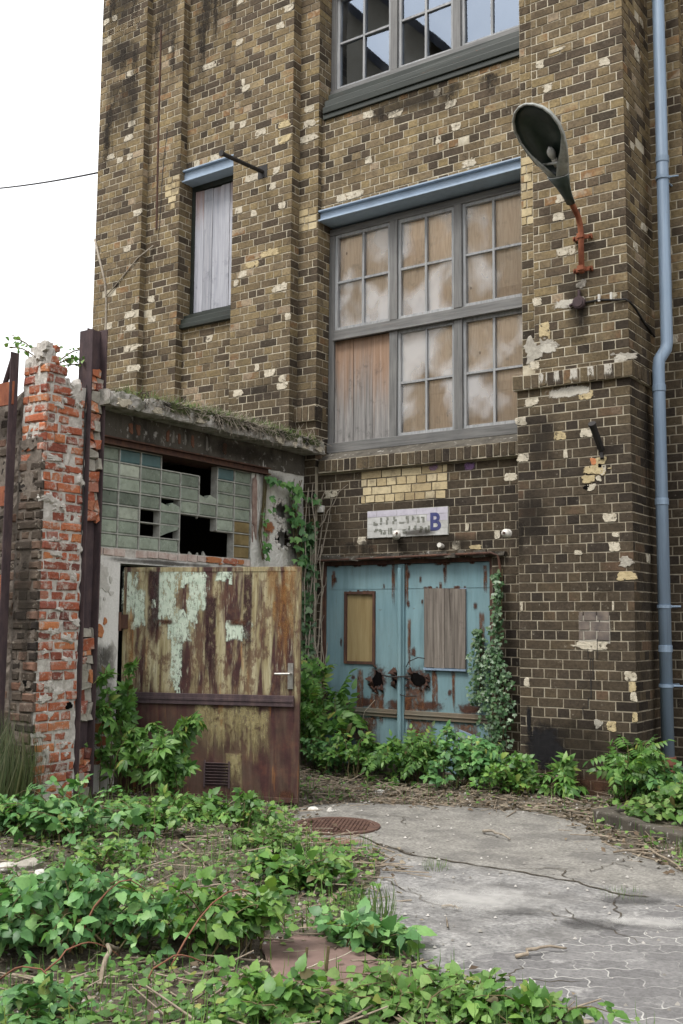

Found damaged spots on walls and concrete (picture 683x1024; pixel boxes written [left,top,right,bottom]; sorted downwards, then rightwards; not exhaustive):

leakage [199,0,217,58]
leakage [104,108,112,150]
flaking render [539,322,559,346]
spalling [581,457,612,491]
spalling [273,498,291,551]
rust [147,570,172,631]
peeling [97,557,247,693]
rust [205,573,252,675]
rust [377,562,466,606]
rust [343,670,486,746]
crack [353,813,650,941]